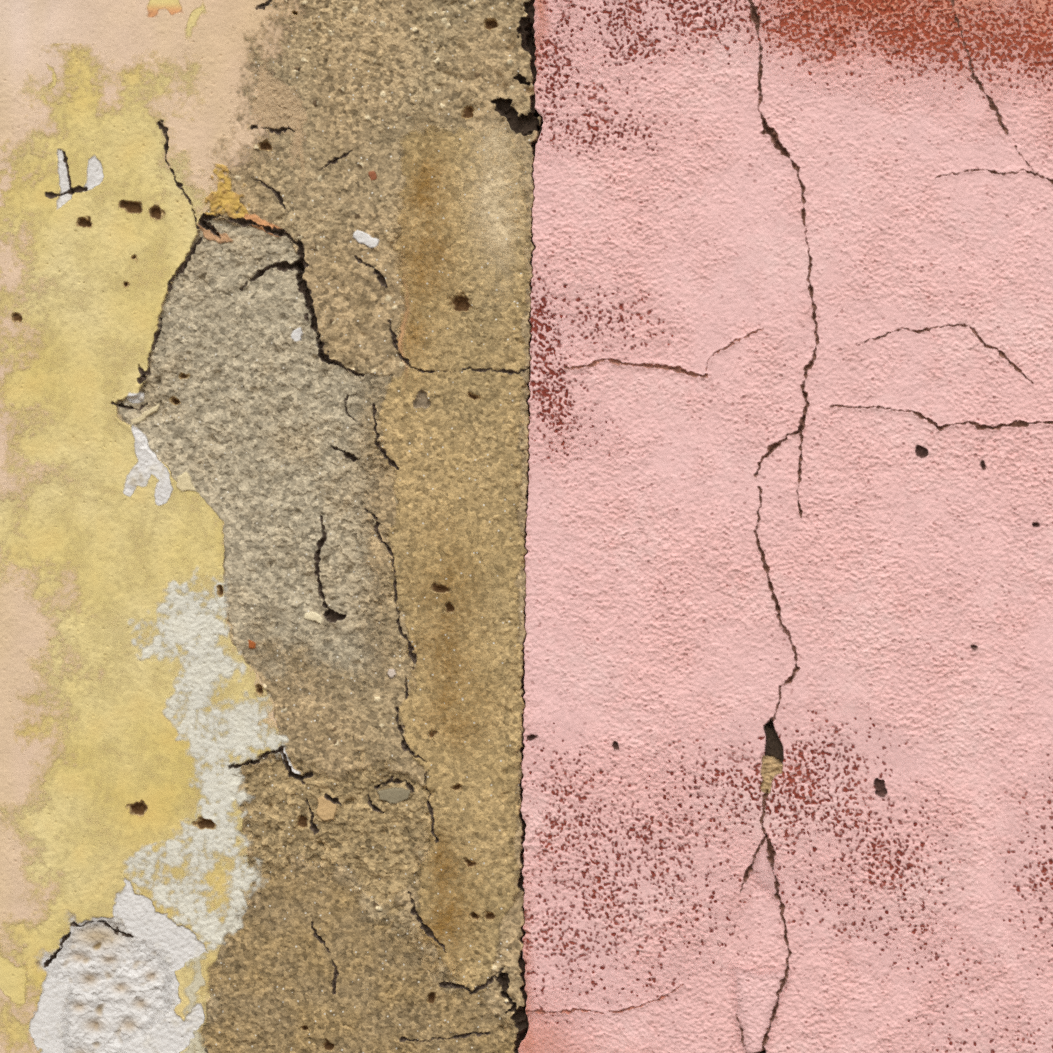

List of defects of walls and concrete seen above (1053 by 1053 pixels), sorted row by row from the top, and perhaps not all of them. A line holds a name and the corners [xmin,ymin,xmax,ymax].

crack [491,0,543,192]
crack [111,319,162,410]
crack [157,120,399,470]
crack [388,320,434,373]
crack [463,234,536,417]
crack [565,329,762,378]
crack [749,0,1053,722]
peeling [0,0,542,1053]
crack [399,610,676,1053]
crack [736,793,791,1051]